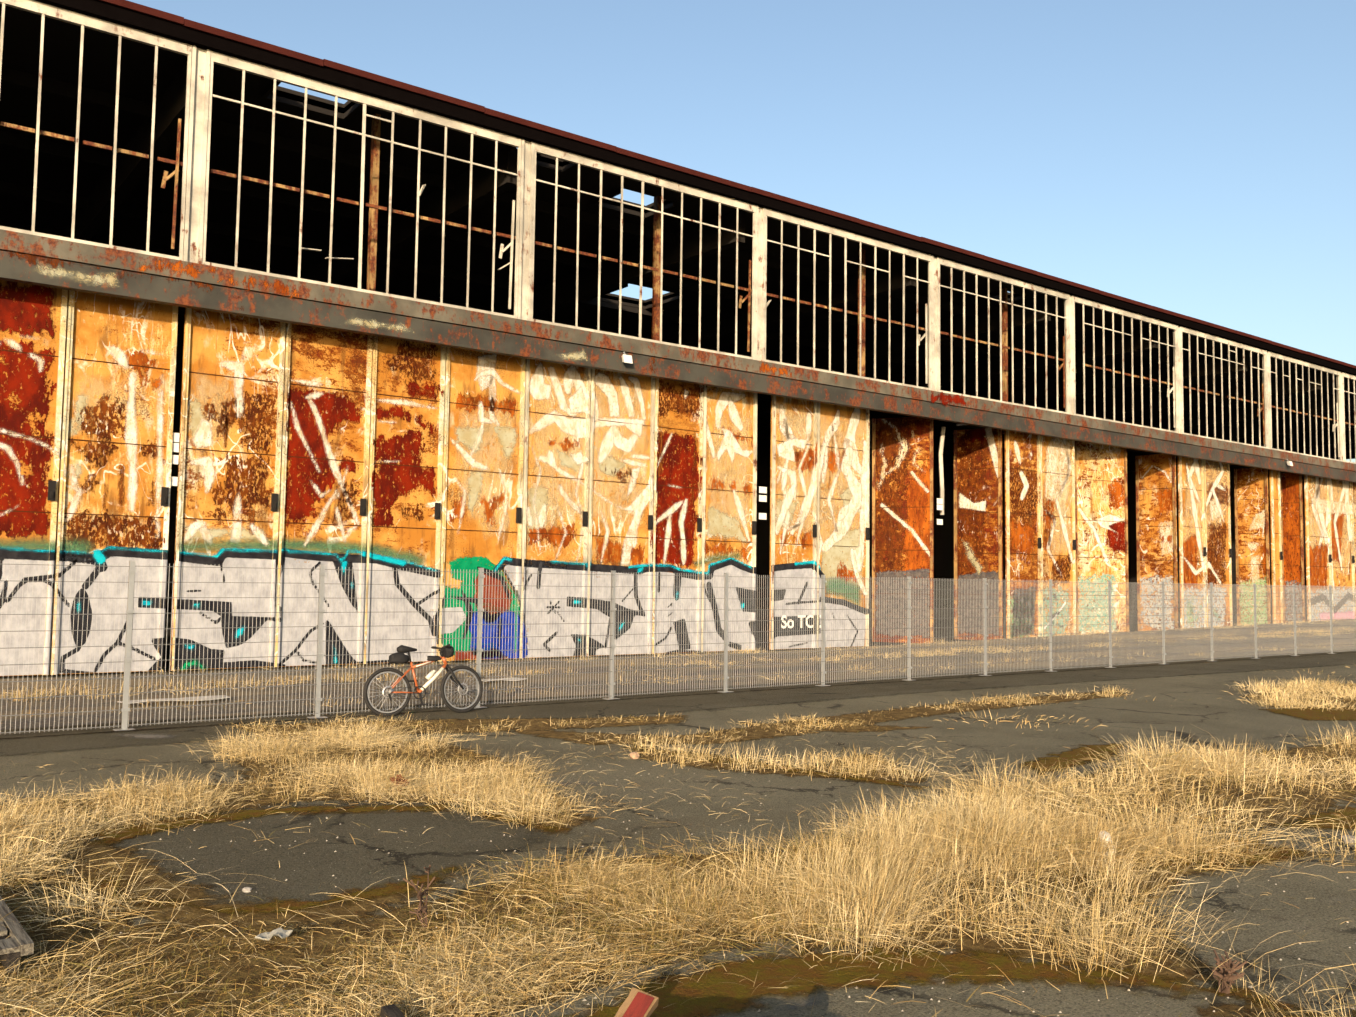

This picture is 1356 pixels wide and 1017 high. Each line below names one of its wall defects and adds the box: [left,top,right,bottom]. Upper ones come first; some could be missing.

corrosion [9,251,100,269]
corrosion [118,259,299,316]
corrosion [0,281,169,557]
corrosion [203,340,516,534]
corrosion [549,437,579,453]
corrosion [596,356,755,568]
corrosion [794,427,847,489]
corrosion [528,522,577,548]
corrosion [780,530,812,549]
corrosion [859,418,930,640]
corrosion [957,428,1072,626]
corrosion [837,561,858,583]